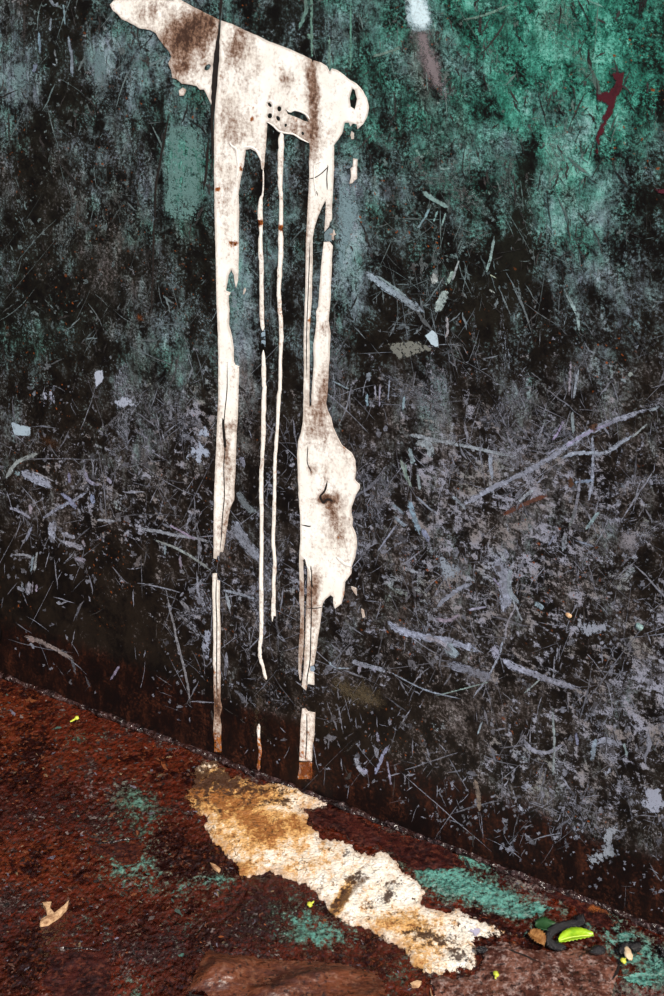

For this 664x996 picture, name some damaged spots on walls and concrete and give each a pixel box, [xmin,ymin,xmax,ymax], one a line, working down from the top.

rust [90,836,146,868]
rust [309,807,467,871]
damp [335,876,369,912]
rust [529,888,614,930]
rust [42,947,112,996]
rust [186,949,387,996]
rust [430,941,618,996]